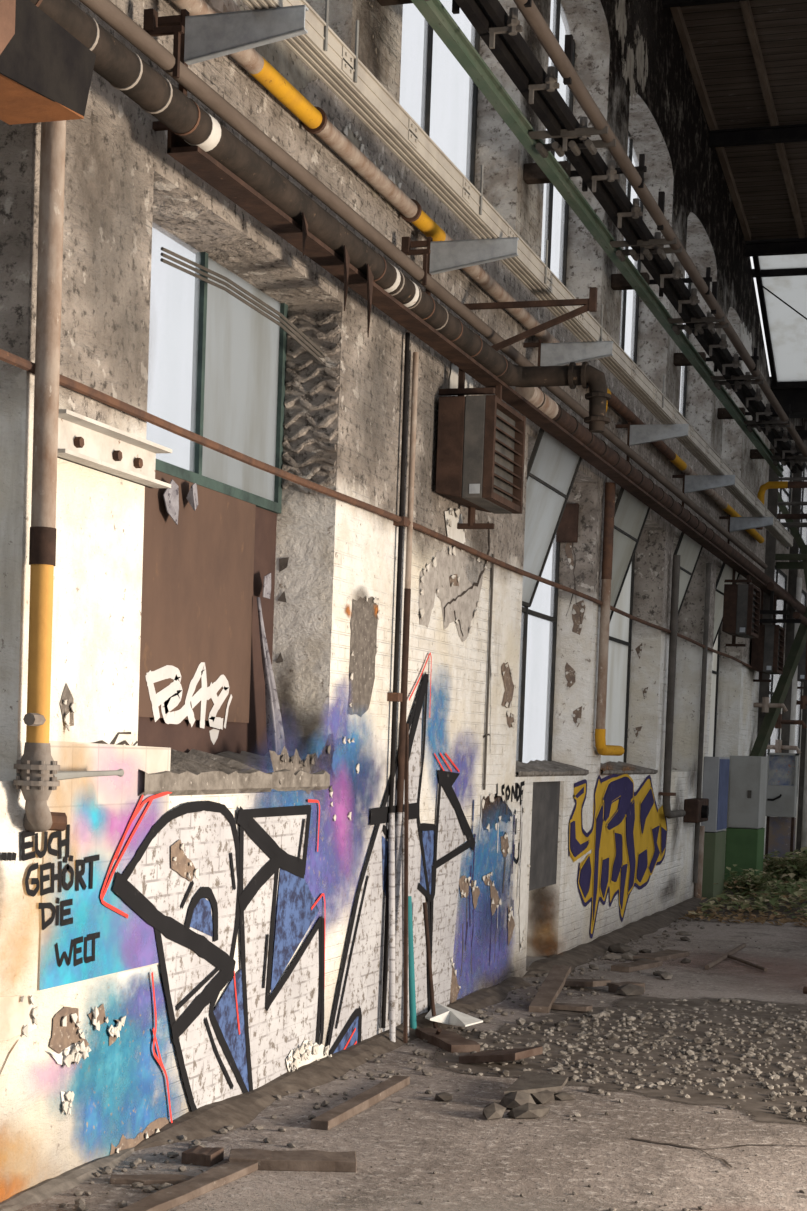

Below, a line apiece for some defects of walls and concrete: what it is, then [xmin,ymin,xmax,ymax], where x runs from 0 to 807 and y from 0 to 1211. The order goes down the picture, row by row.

peeling [615,0,648,103]
peeling [419,508,487,642]
flaking render [347,596,380,717]
peeling [171,839,199,882]
peeling [0,995,38,1041]
flaking render [48,1004,126,1067]
peeling [61,1091,74,1115]
rust [0,1185,14,1202]